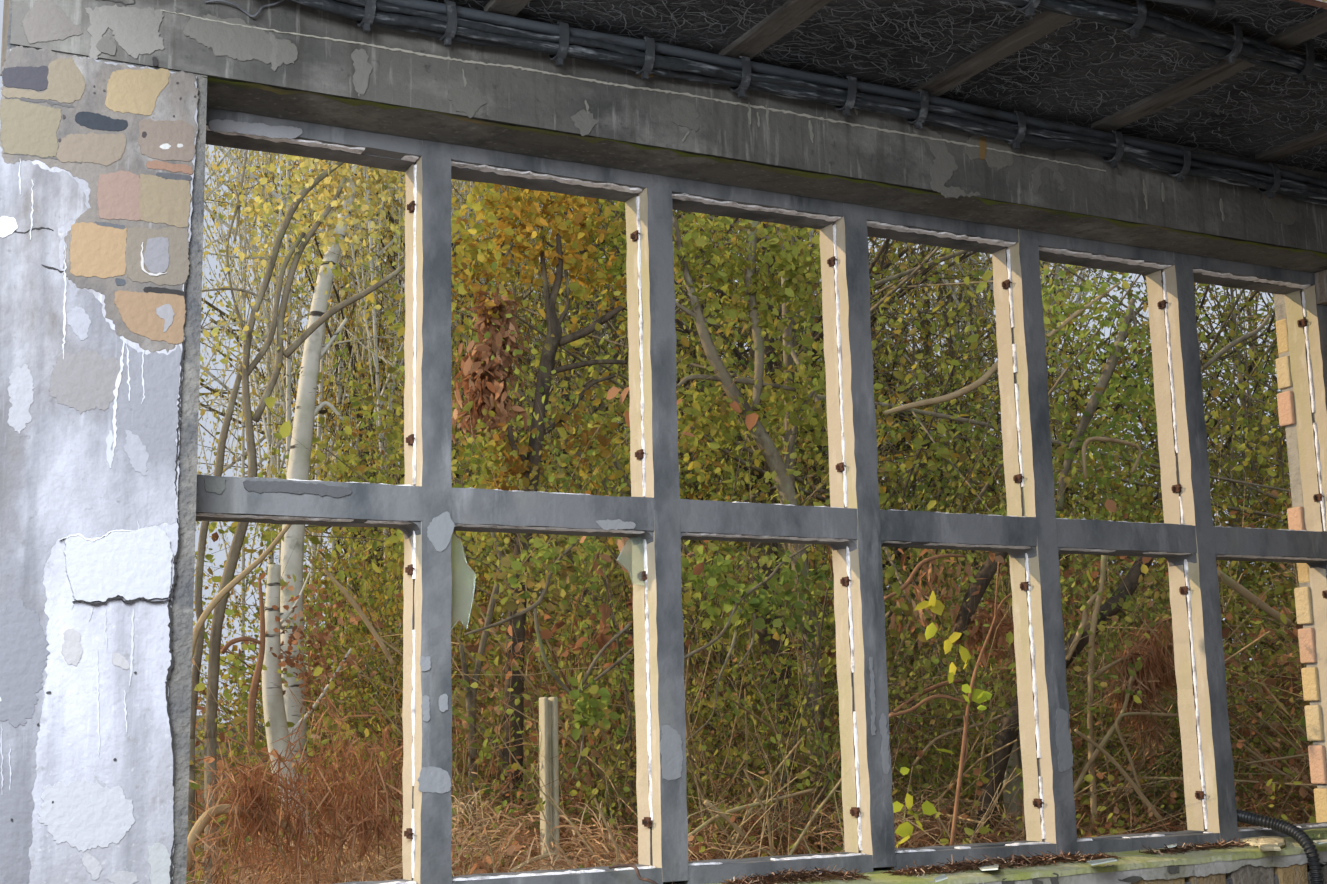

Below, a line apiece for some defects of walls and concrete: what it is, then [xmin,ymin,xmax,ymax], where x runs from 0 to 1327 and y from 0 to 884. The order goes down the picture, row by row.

flaking render [0,4,303,344]
leakage [7,246,149,476]